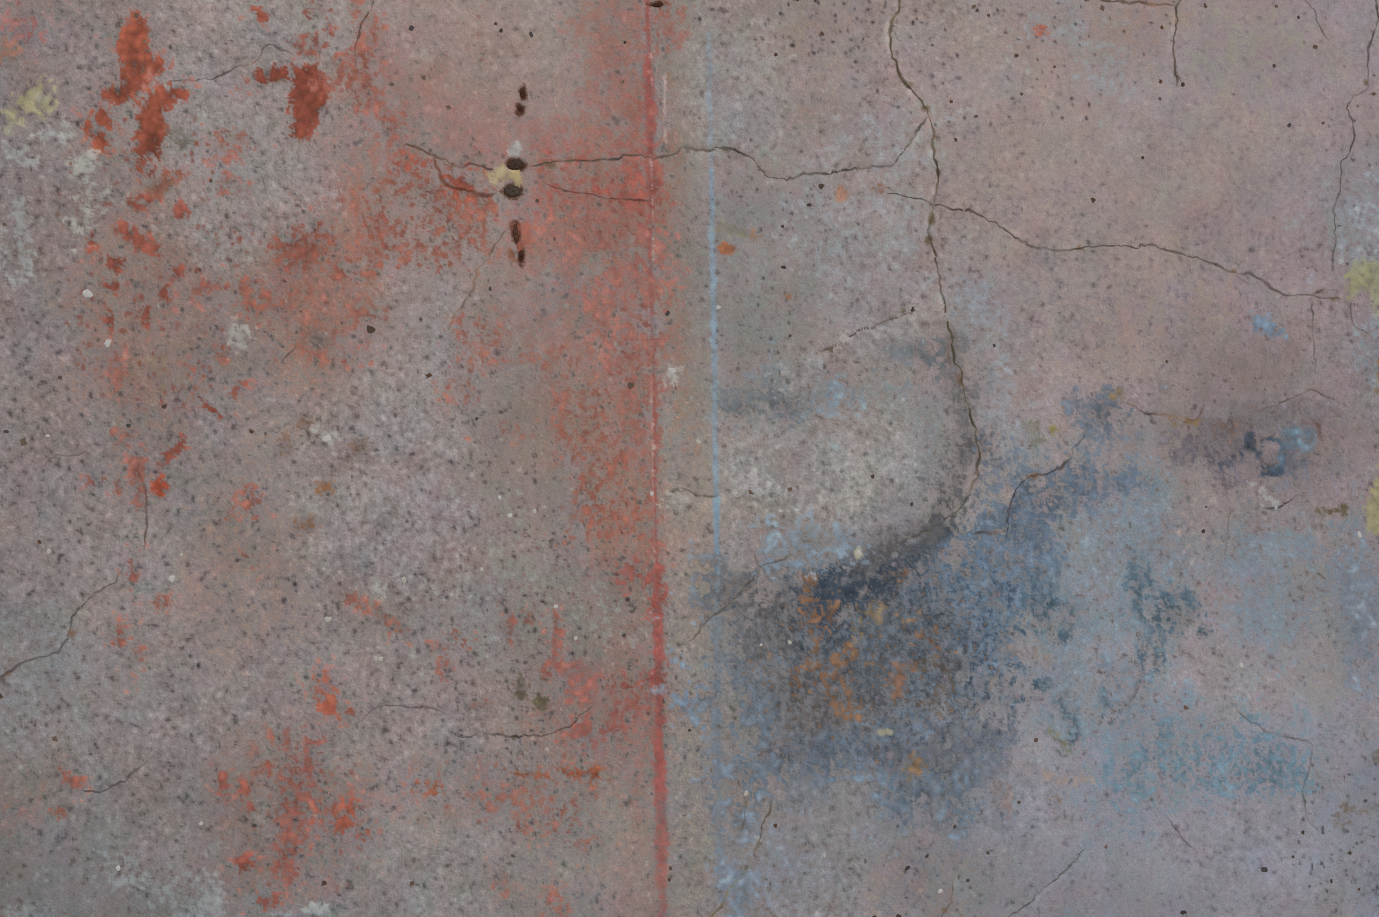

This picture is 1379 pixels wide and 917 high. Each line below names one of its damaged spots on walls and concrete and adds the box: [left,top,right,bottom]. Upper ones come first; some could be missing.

crack [354,0,374,67]
crack [404,143,508,329]
crack [532,0,1379,595]